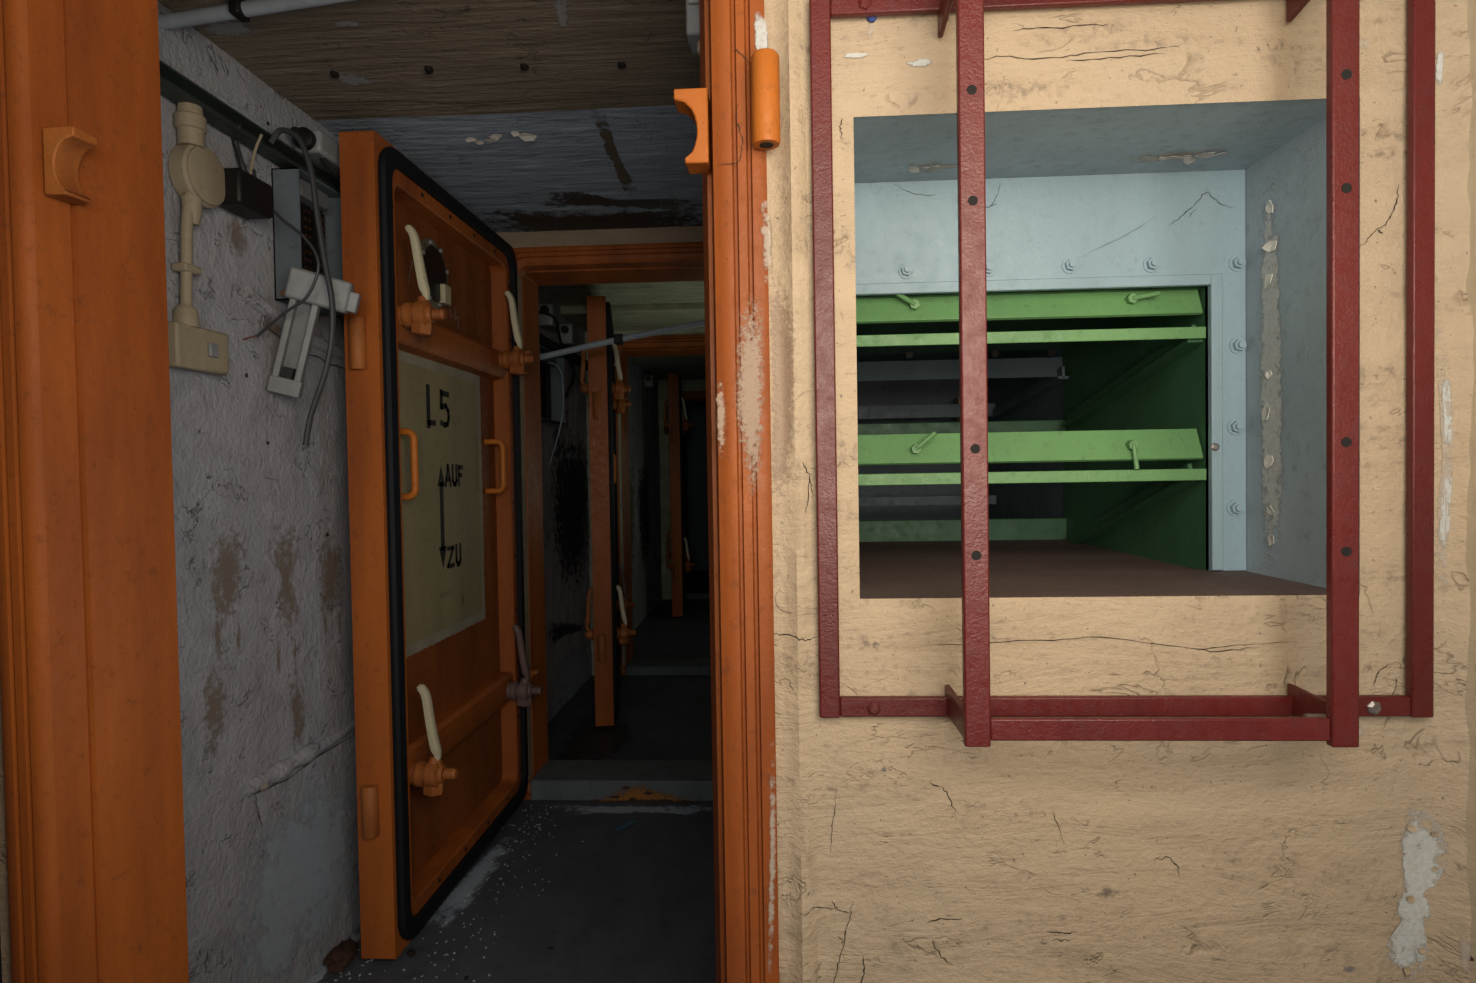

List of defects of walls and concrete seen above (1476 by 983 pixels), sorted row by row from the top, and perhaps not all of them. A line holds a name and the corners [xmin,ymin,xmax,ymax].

peeling [465,131,537,145]
water stain [483,115,703,233]
water stain [204,677,225,753]
water stain [212,534,245,652]
water stain [270,530,298,621]
water stain [277,640,305,742]
crack [923,636,1296,652]
peeling [1388,810,1445,976]